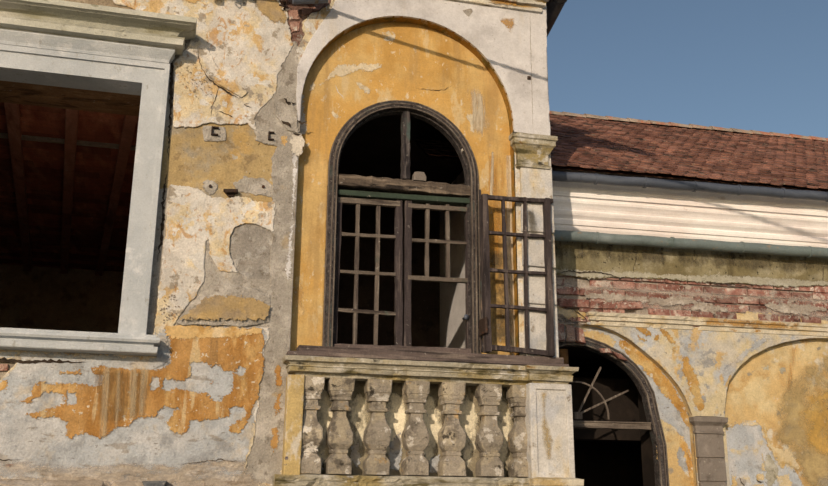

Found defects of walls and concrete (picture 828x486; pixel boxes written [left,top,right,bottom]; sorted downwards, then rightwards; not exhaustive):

peeling [0,0,382,486]
crack [157,40,252,262]
flaking render [555,268,828,486]